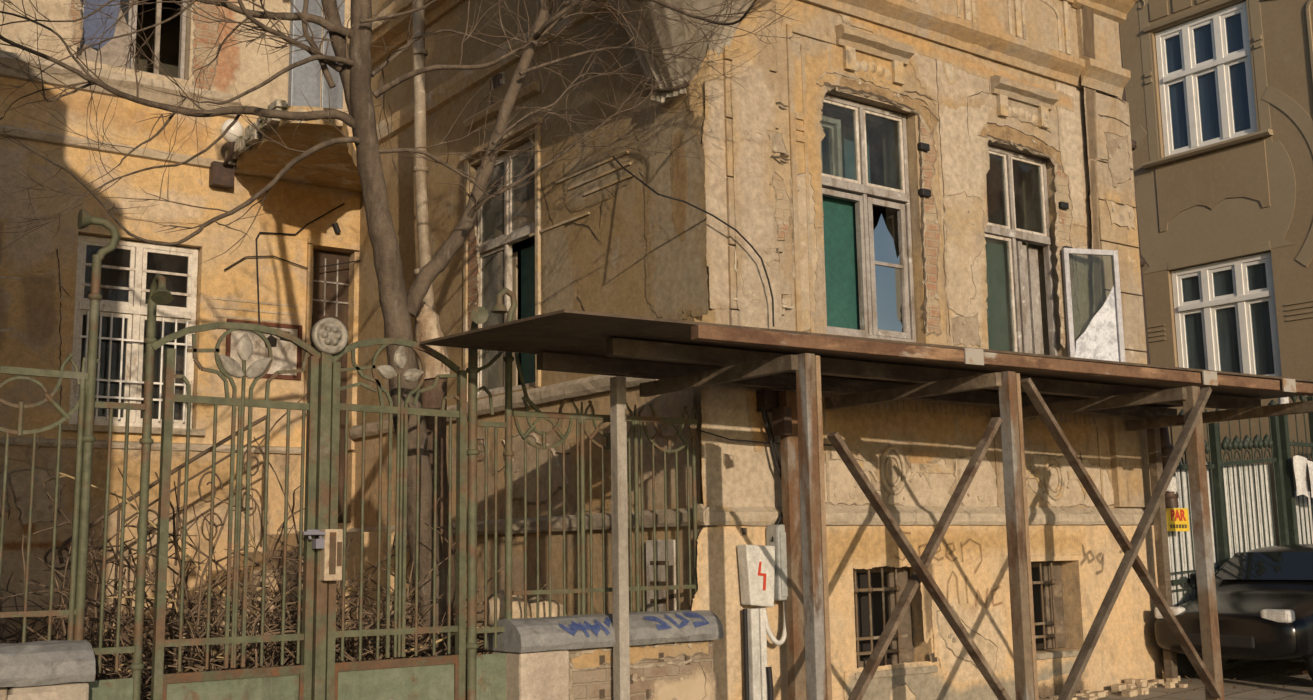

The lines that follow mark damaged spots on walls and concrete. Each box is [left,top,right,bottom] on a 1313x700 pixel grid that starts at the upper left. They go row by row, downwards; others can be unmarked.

flaking render [190,1,221,90]
flaking render [740,171,820,332]
flaking render [816,72,986,347]
flaking render [889,682,917,700]